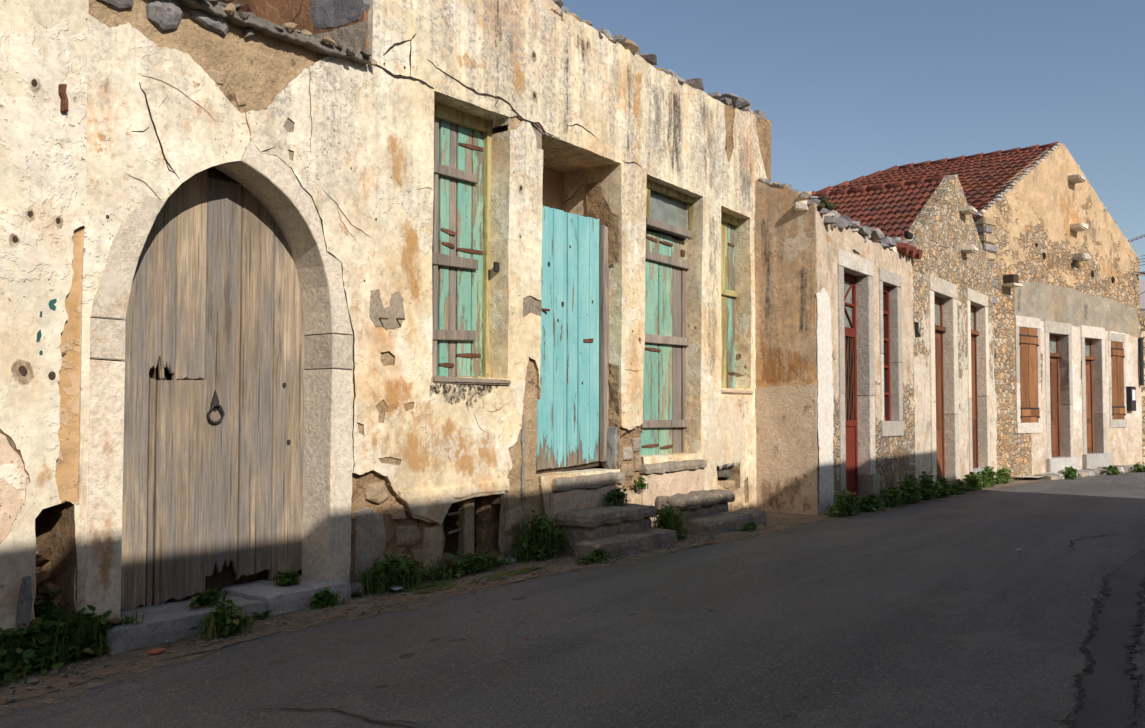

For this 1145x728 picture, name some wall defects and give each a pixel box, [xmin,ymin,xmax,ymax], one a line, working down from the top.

crack [125,75,213,200]
flaking render [88,0,325,113]
crack [306,68,314,148]
crack [375,34,595,139]
crack [245,104,372,473]
flaking render [523,296,542,316]
flaking render [0,429,30,543]
spalling [12,361,33,384]
flaking render [33,218,83,616]
spalling [350,457,459,589]
flaking render [477,359,544,563]